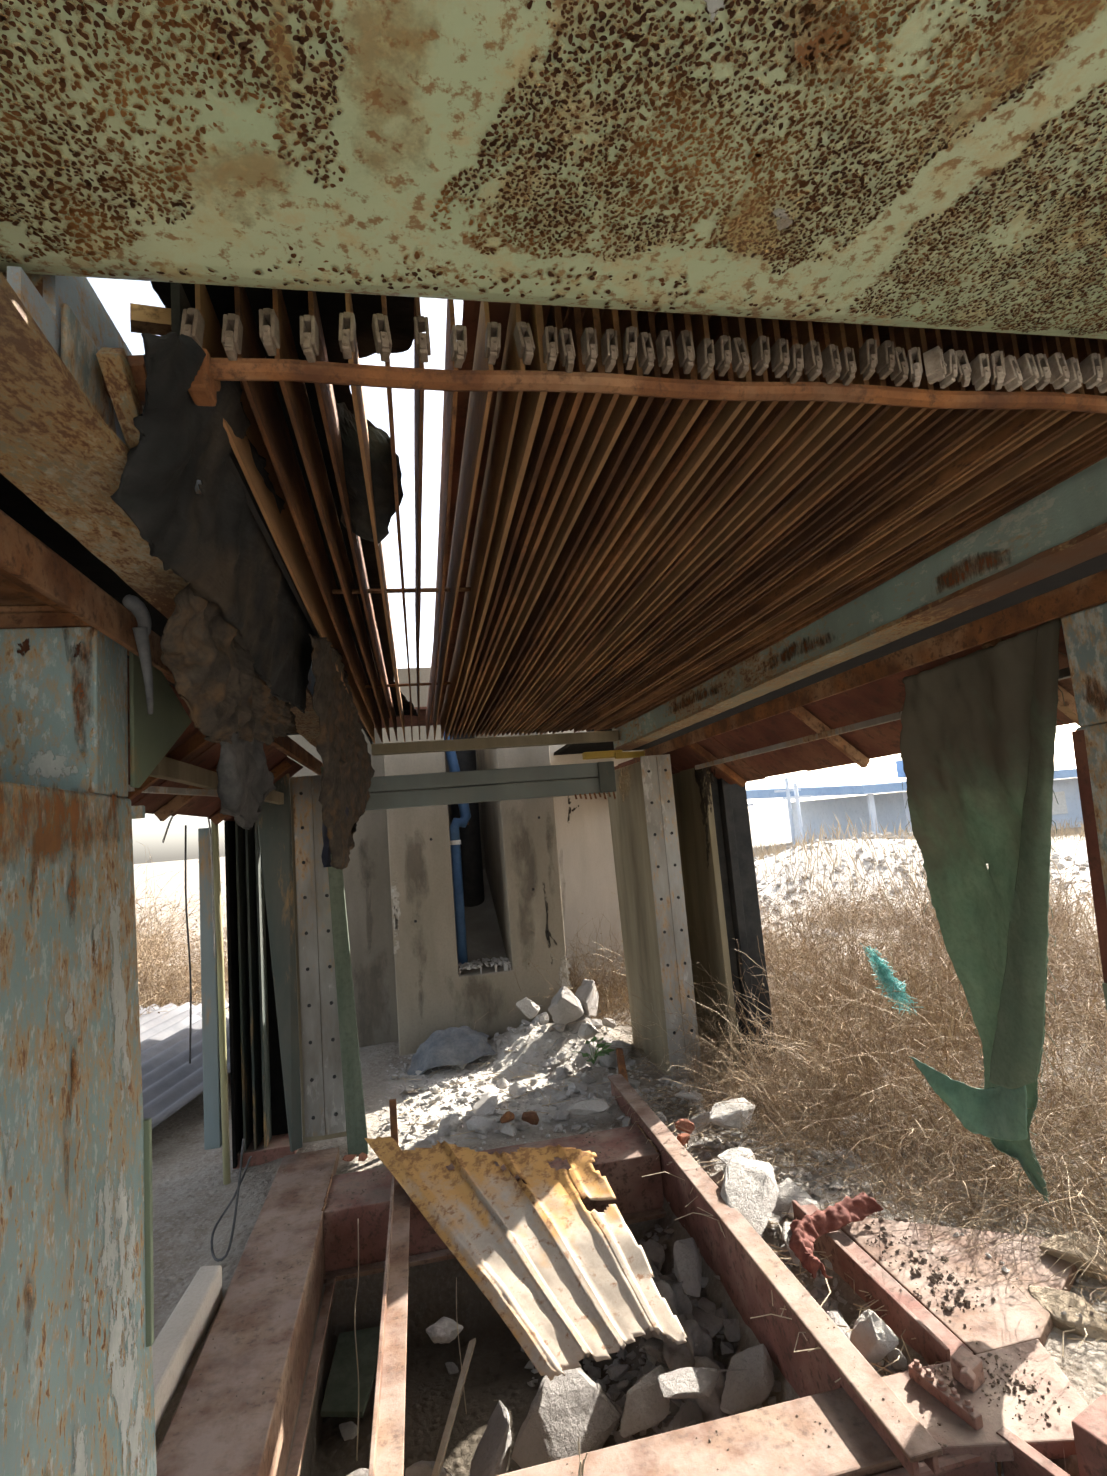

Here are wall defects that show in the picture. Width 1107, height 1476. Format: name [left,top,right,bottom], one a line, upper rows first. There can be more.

rust [791,0,862,89]
rust [937,550,1010,592]
rust [17,638,30,656]
rust [64,629,92,742]
rust [1084,680,1107,712]
rust [0,787,119,914]
rust [69,1055,77,1117]